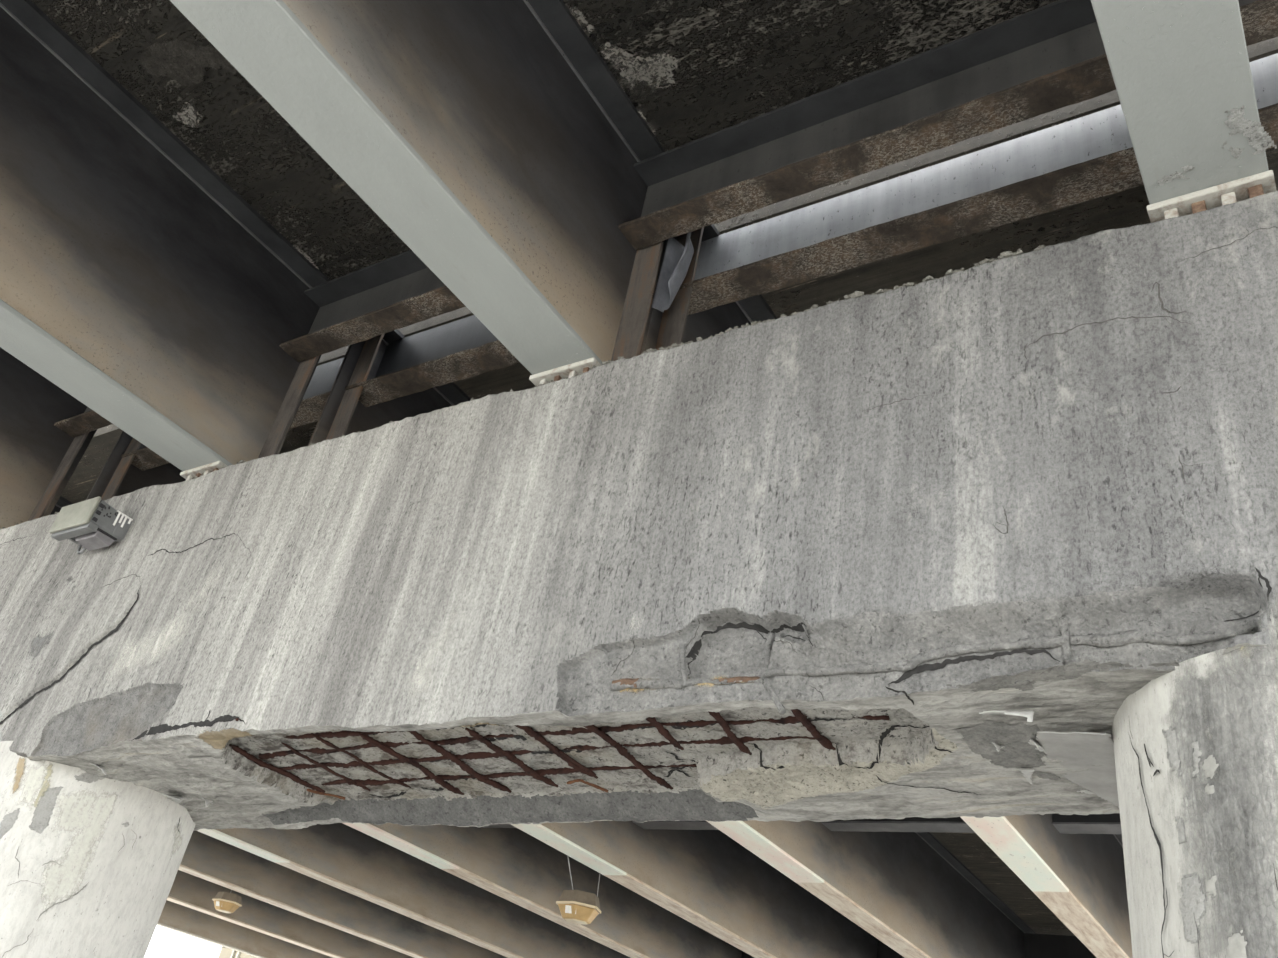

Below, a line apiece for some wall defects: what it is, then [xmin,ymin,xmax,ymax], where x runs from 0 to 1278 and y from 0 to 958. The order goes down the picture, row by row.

crack [0,533,250,724]
crack [1255,567,1278,637]
crack [131,711,245,741]
spalling [196,584,1266,827]
peeling [0,763,107,839]
crack [1128,721,1200,958]
peeling [1175,815,1186,844]
peeling [1179,872,1217,944]
peeling [1226,930,1247,958]